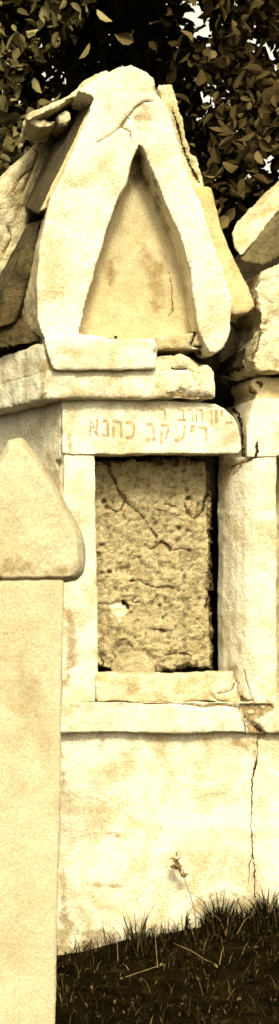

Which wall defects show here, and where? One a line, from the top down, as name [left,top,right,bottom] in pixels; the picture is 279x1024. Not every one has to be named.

crack [97,101,200,183]
crack [106,463,204,551]
crack [131,579,174,603]
crack [147,671,262,903]